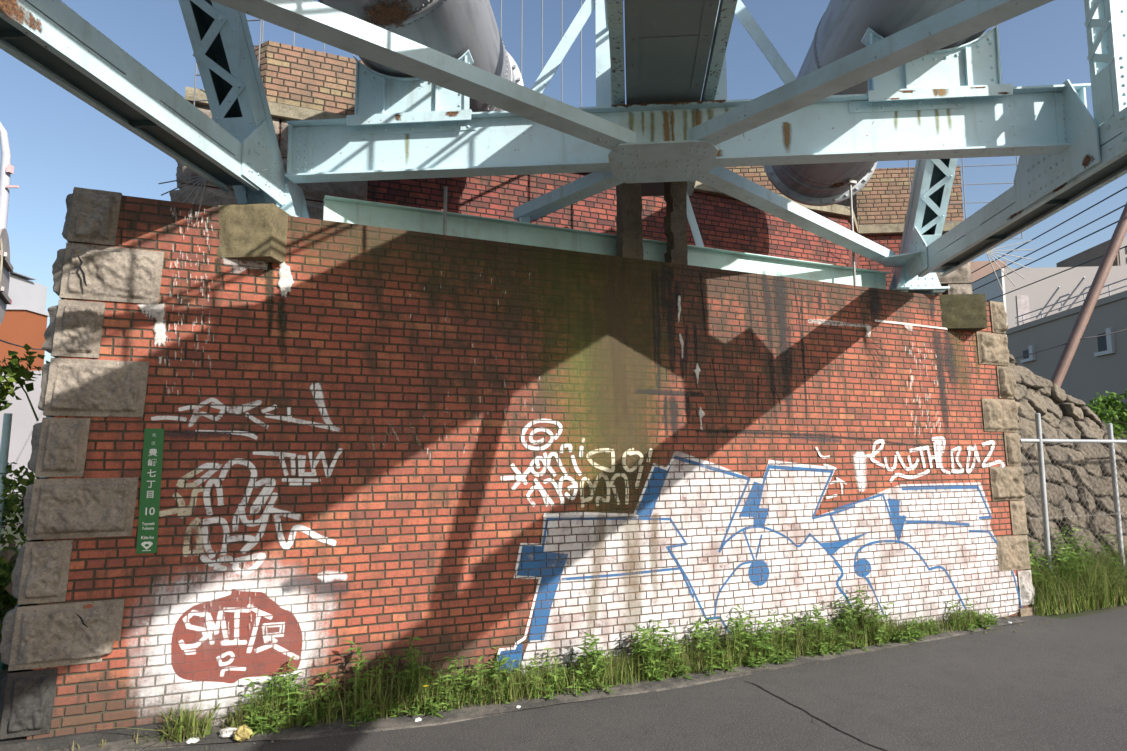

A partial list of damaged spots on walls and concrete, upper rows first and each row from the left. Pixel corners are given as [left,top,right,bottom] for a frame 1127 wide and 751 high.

corrosion [0,0,42,32]
corrosion [362,0,412,27]
corrosion [611,100,728,142]
crack [72,255,87,286]
water stain [138,258,294,394]
water stain [636,267,962,449]